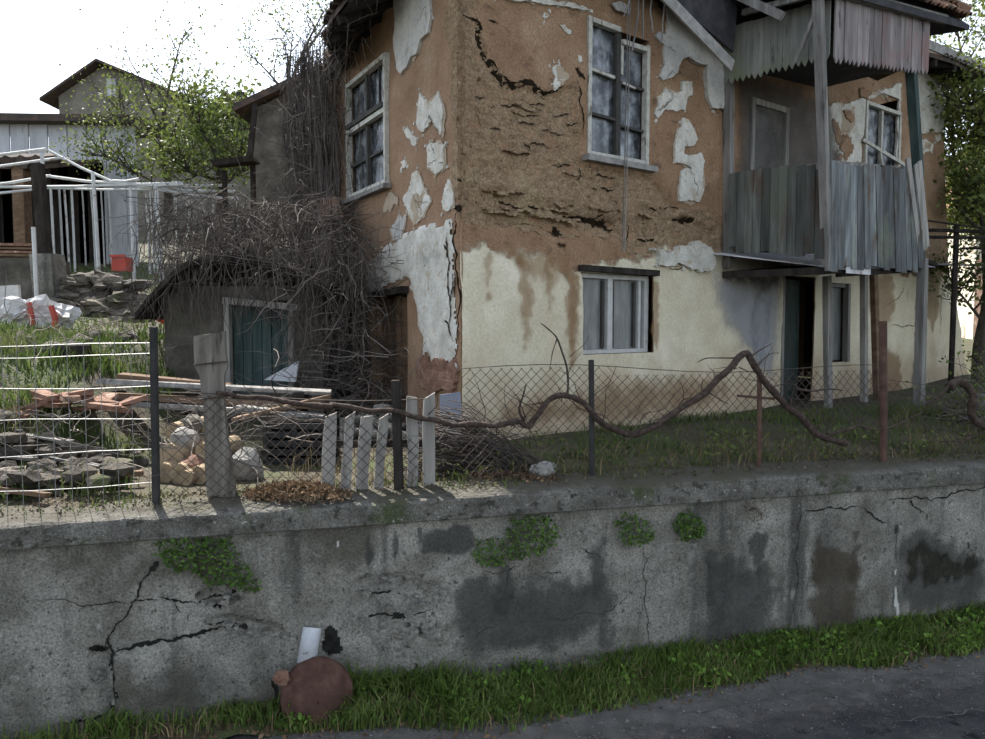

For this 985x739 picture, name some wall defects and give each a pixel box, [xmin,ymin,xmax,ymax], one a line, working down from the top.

peeling [393,0,435,75]
peeling [381,88,455,242]
peeling [548,59,569,91]
crack [463,15,695,257]
peeling [654,7,725,206]
peeling [828,83,902,163]
peeling [918,73,945,154]
crack [11,561,271,725]
spalling [348,572,449,671]
water stain [458,540,612,650]
crack [790,487,985,626]
water stain [894,525,983,616]